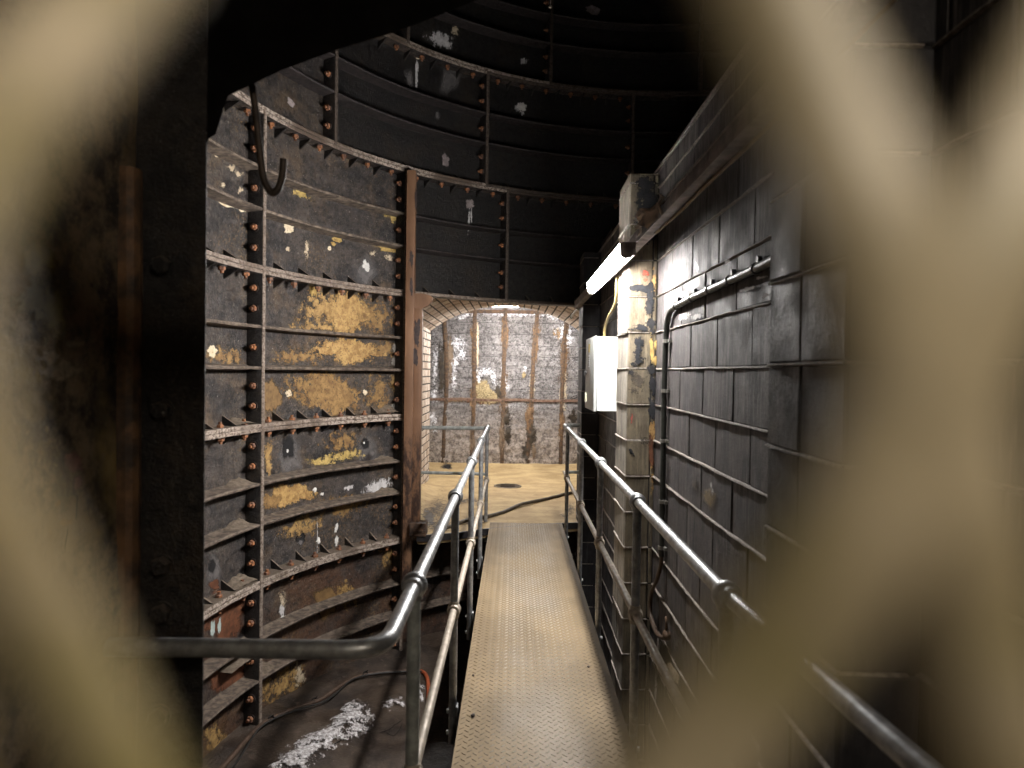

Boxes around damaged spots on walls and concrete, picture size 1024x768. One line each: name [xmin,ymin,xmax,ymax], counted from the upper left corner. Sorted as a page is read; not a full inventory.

water stain [451,336,468,395]
corrosion [437,315,508,454]
corrosion [525,317,541,431]
corrosion [556,324,570,446]
water stain [344,477,393,493]
corrosion [204,599,245,638]
water stain [267,696,405,768]